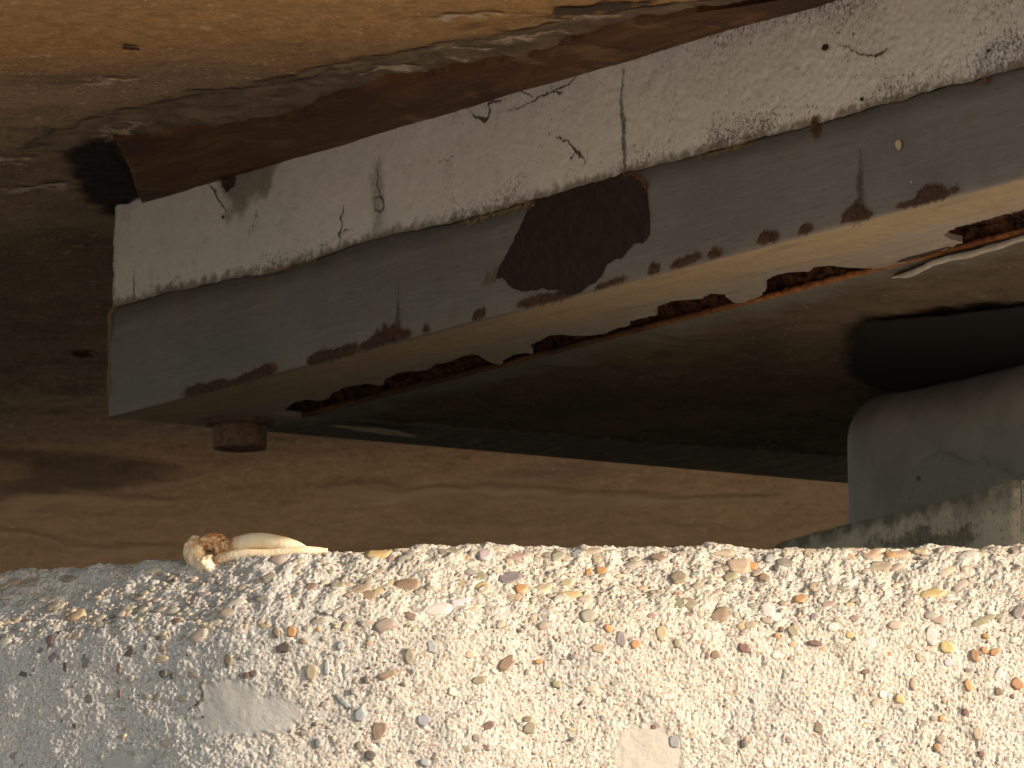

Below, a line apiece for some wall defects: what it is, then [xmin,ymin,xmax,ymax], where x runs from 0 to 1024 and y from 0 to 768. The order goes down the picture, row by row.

crack [471,77,575,123]
crack [555,136,585,164]
crack [375,173,384,213]
corrosion [841,161,872,223]
corrosion [895,184,957,209]
peeling [496,172,649,295]
corrosion [798,224,811,235]
corrosion [301,227,1024,418]